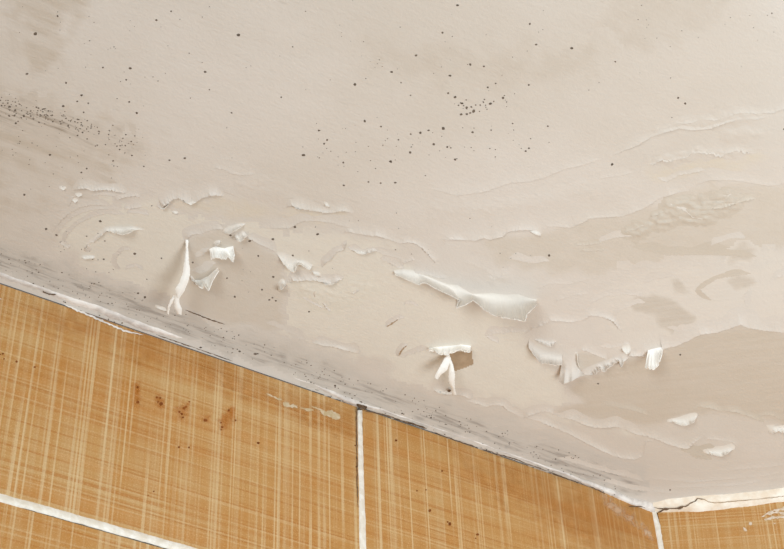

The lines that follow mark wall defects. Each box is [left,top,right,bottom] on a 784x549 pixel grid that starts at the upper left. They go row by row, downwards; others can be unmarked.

peeling [50,178,149,248]
peeling [155,193,383,354]
water stain [0,66,784,499]
peeling [394,267,784,384]
peeling [395,342,784,460]